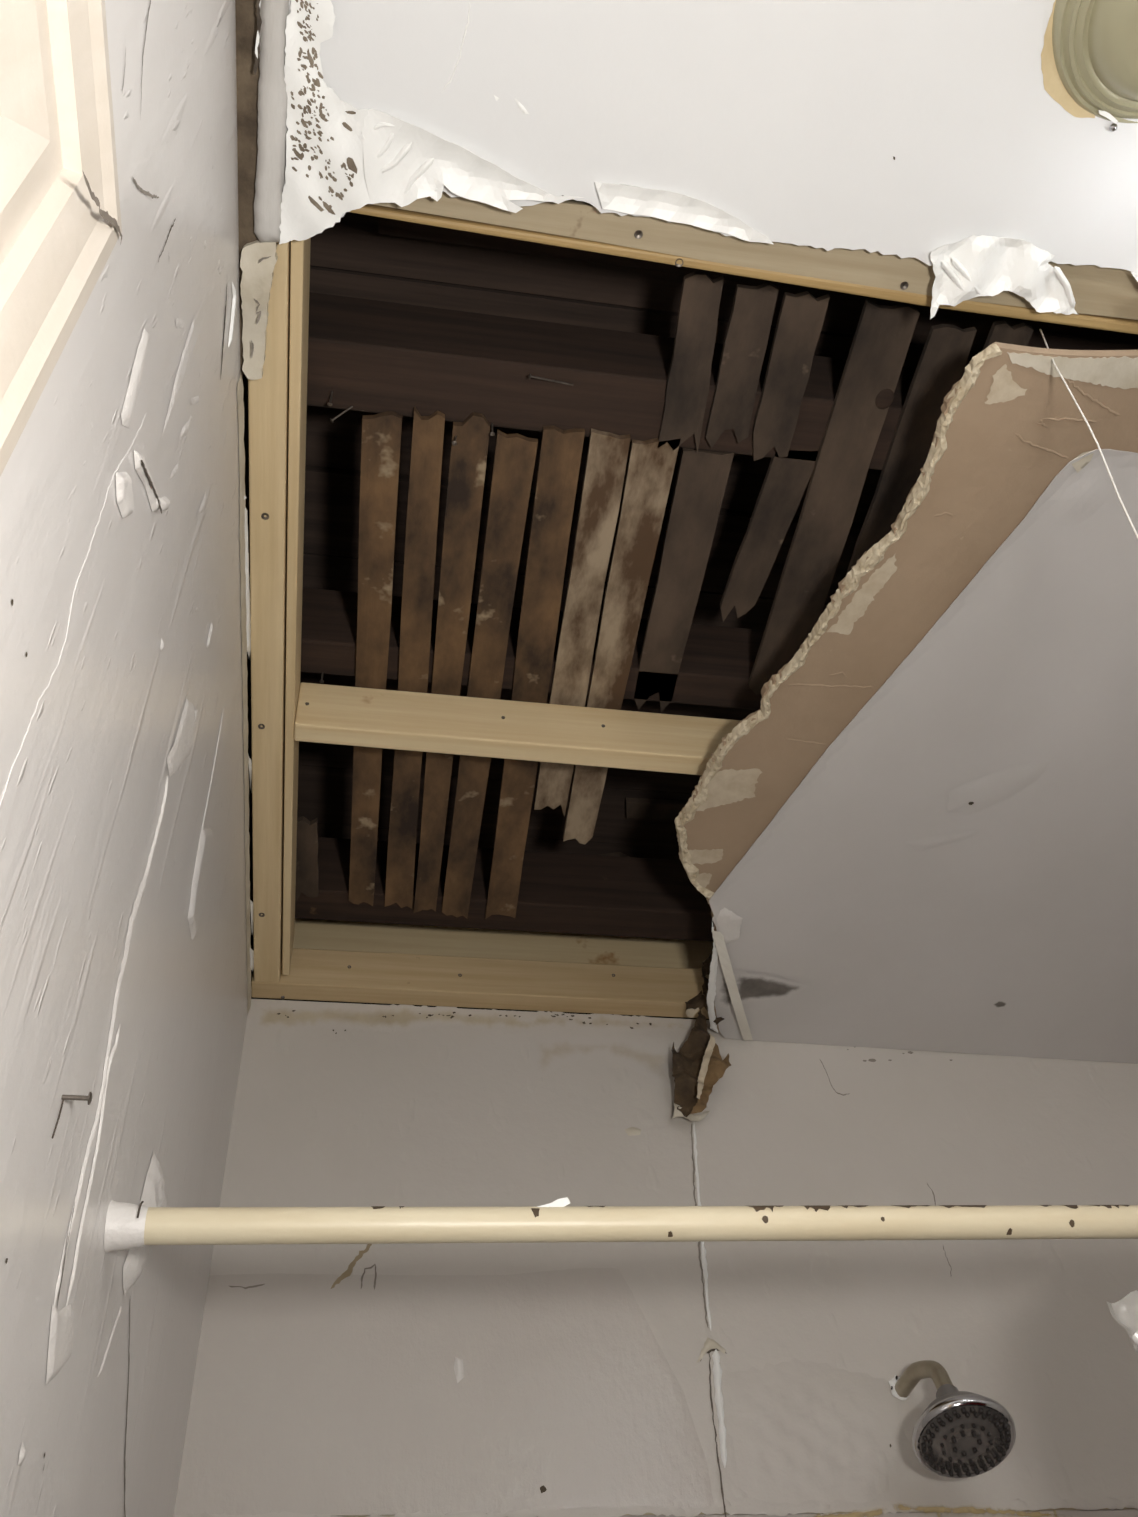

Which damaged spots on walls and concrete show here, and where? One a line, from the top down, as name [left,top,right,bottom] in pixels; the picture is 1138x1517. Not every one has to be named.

peeling [930,235,1077,319]
spalling [674,343,1002,899]
peeling [707,922,718,1033]
crack [691,1124,701,1206]
crack [696,1242,727,1517]